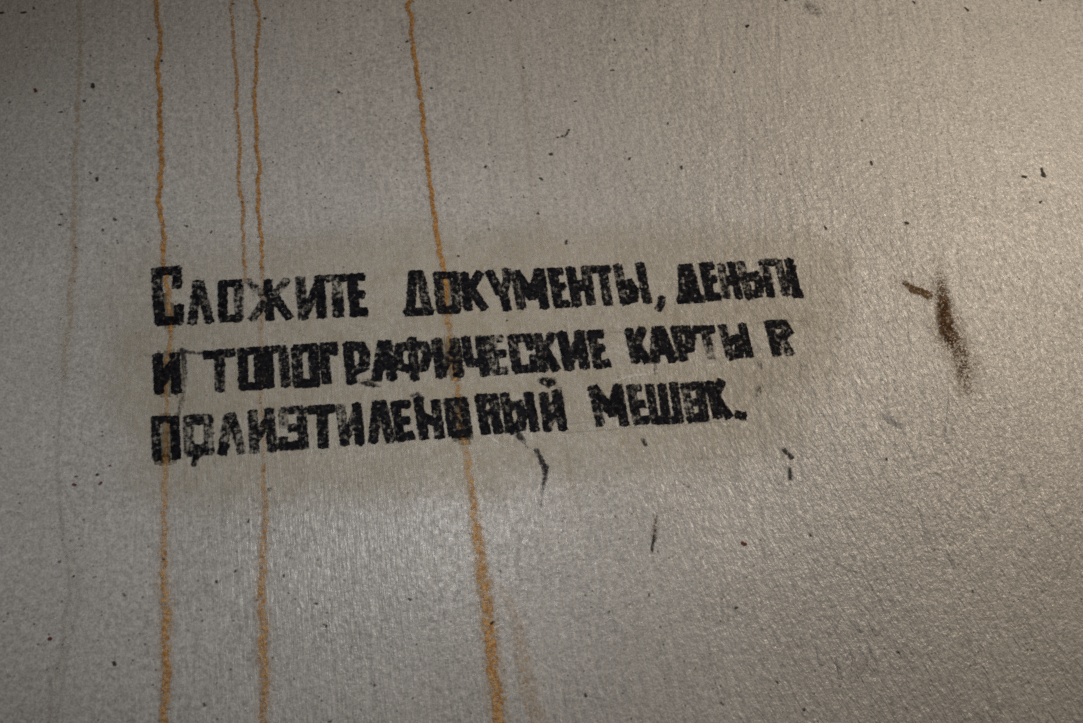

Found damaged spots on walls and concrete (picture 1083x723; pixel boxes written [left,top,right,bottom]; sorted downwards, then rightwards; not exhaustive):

rust [154,0,172,364]
rust [229,0,265,299]
rust [405,0,506,723]
rust [903,266,975,392]
rust [156,381,172,723]
rust [257,392,271,722]